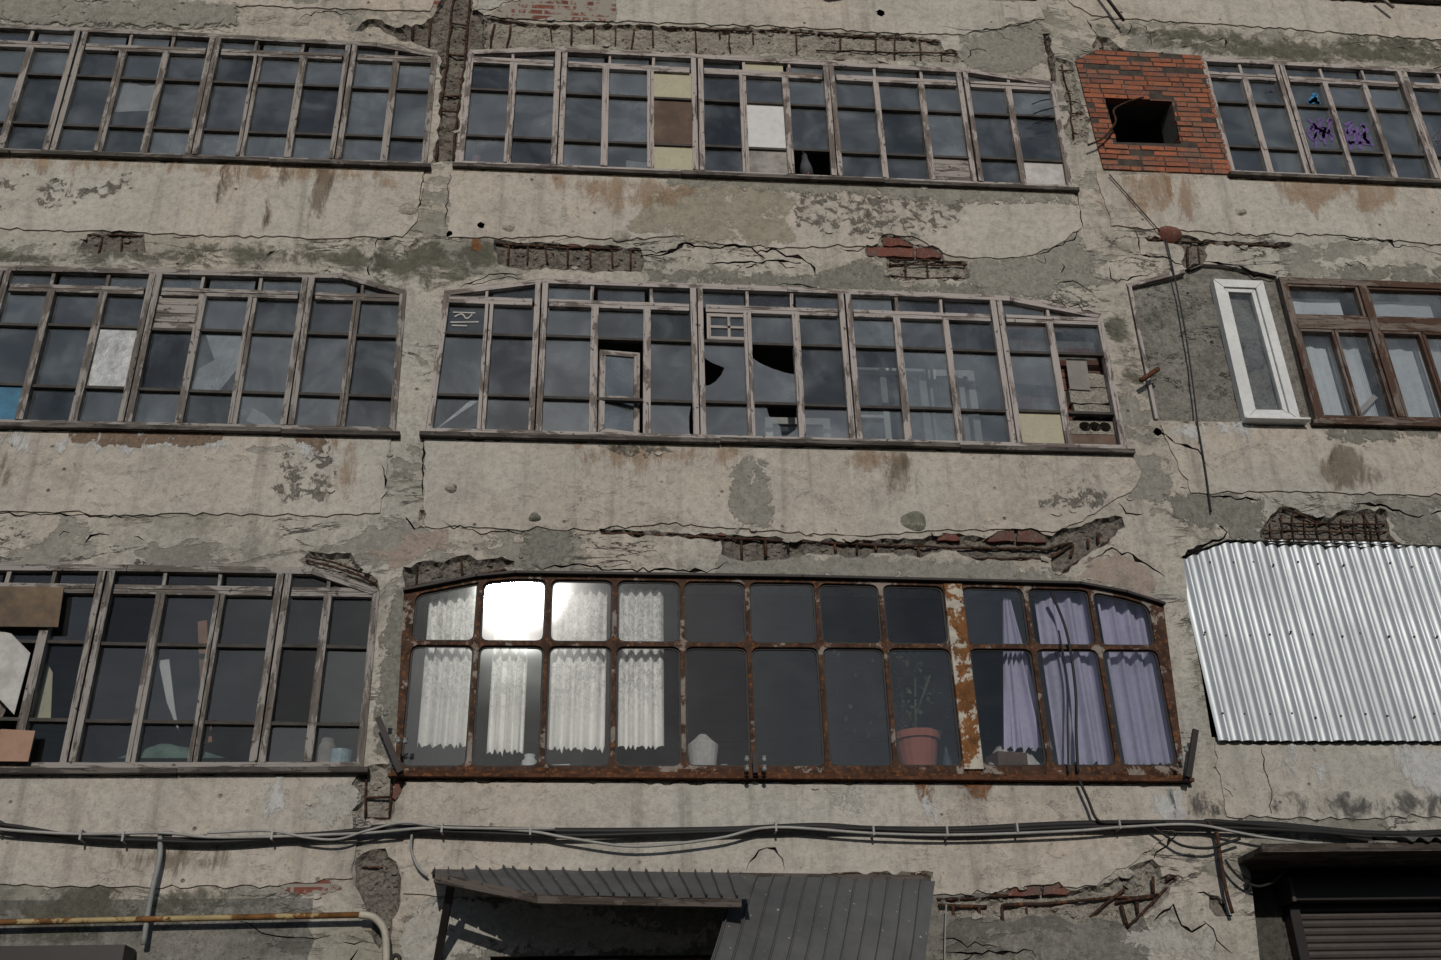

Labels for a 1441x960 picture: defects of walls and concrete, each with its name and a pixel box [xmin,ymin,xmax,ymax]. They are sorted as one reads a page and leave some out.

peeling [0,0,239,30]
spalling [356,0,1090,163]
crack [640,242,821,288]
peeling [493,176,1110,302]
crack [1345,238,1441,270]
peeling [273,436,337,503]
spalling [599,455,1157,597]
spalling [1126,453,1441,548]
peeling [298,527,575,827]
peeling [280,848,722,960]
crack [941,938,1036,960]
crack [1154,892,1232,953]